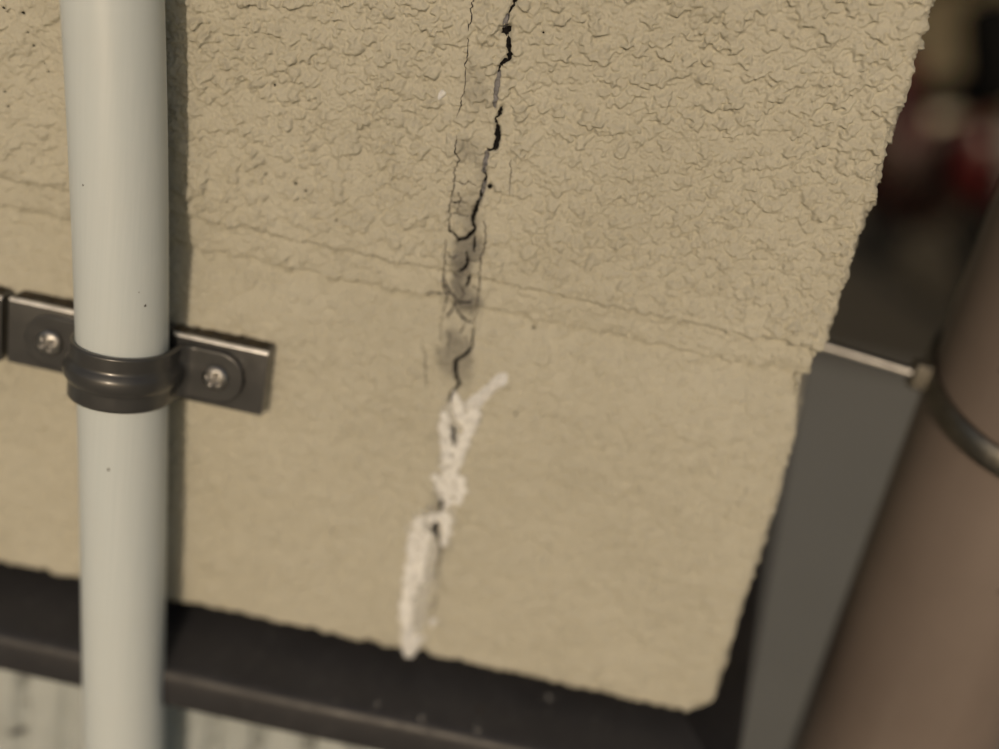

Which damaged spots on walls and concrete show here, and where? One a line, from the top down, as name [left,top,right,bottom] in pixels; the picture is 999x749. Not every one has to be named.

crack [422,0,518,402]
crack [430,499,444,610]
crack [449,426,457,446]
efflorescence [398,373,508,658]